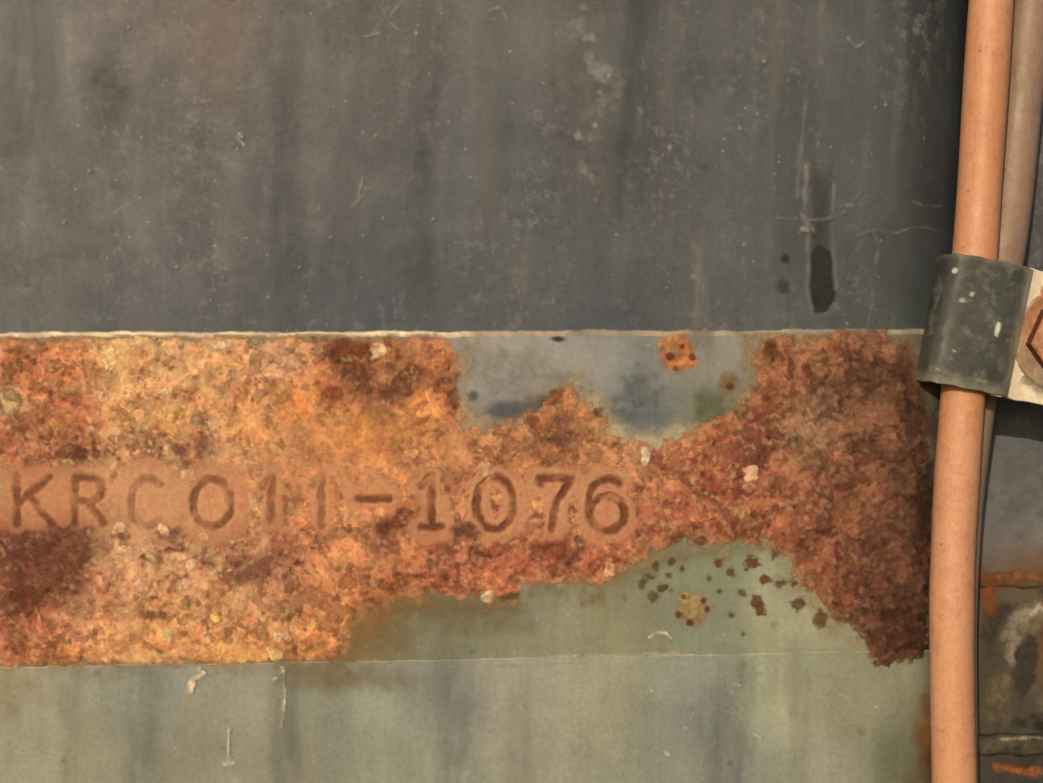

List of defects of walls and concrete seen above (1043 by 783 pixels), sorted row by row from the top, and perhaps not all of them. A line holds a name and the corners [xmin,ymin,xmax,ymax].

water stain [809,198,836,312]
rust [0,328,933,669]
rust [979,566,1043,614]
rust [992,763,1041,775]